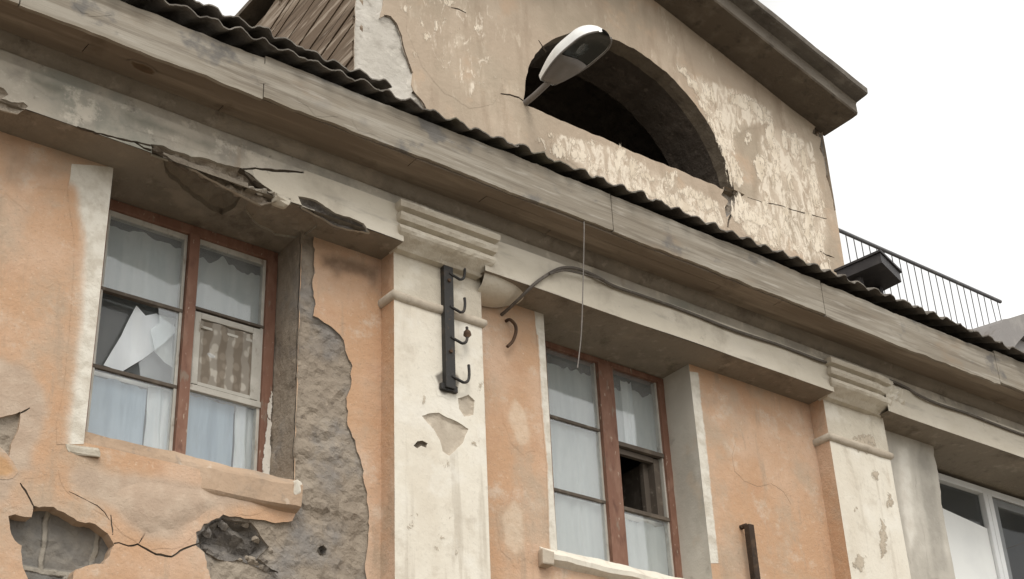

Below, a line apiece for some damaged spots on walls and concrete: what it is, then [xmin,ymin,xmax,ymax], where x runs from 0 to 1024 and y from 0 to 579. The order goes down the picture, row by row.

peeling [354,0,507,108]
peeling [537,66,836,269]
spalling [150,144,370,579]
spalling [0,407,30,455]
spalling [414,395,477,466]
spalling [8,505,114,579]
crack [71,492,201,558]
peeling [853,554,865,572]
peeling [879,520,888,557]